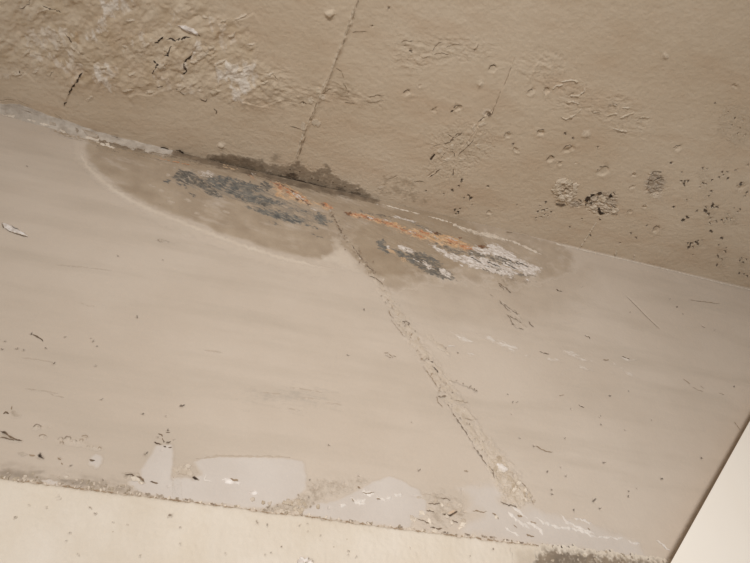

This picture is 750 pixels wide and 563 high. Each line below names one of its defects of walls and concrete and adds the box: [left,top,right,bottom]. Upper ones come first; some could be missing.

crack [291,0,368,161]
rust [268,181,334,212]
water stain [70,140,607,354]
crack [334,217,384,287]
rust [343,210,474,251]
spalling [535,143,621,220]
spalling [630,169,668,211]
crack [424,361,534,508]
peeling [121,428,428,528]